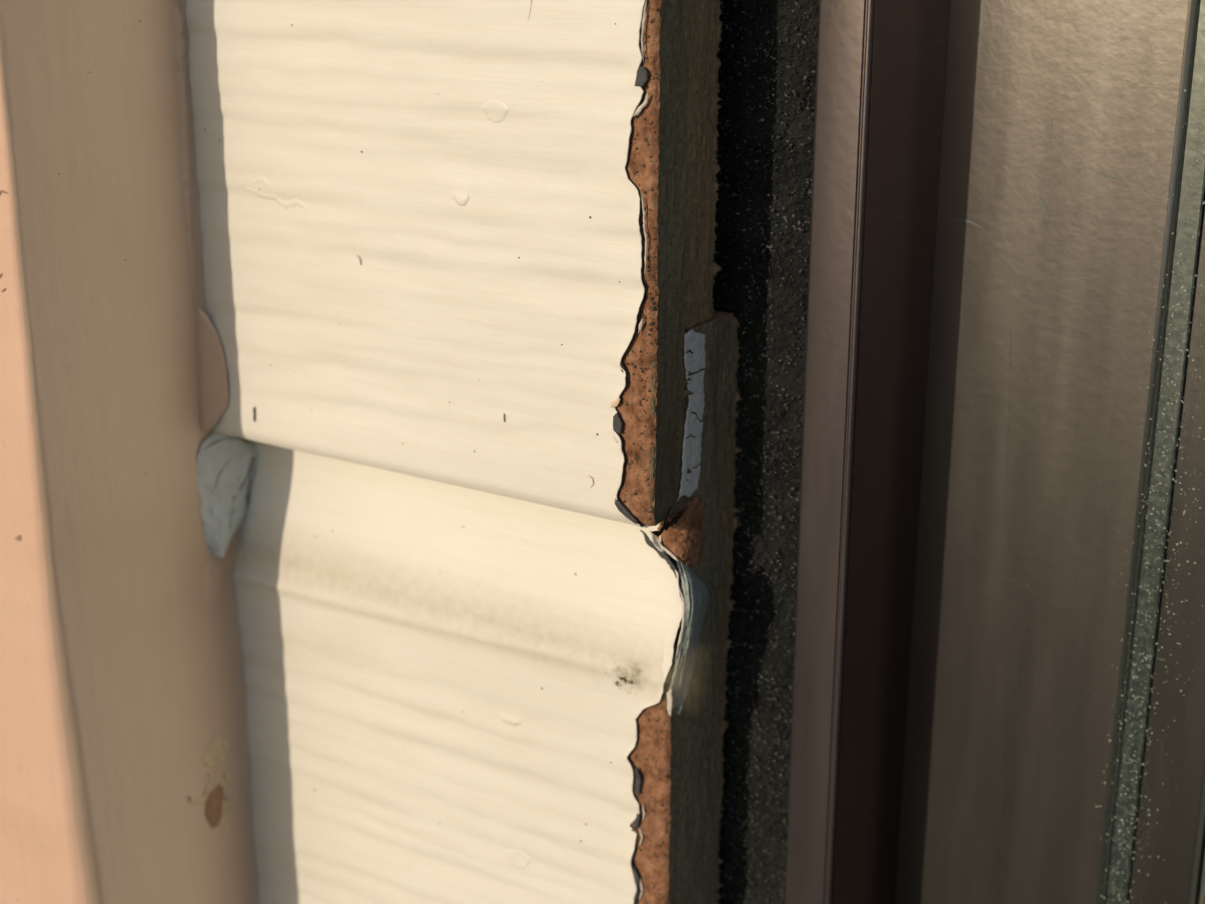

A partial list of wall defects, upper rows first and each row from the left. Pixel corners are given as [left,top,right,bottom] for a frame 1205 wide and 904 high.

spalling [611,0,709,904]